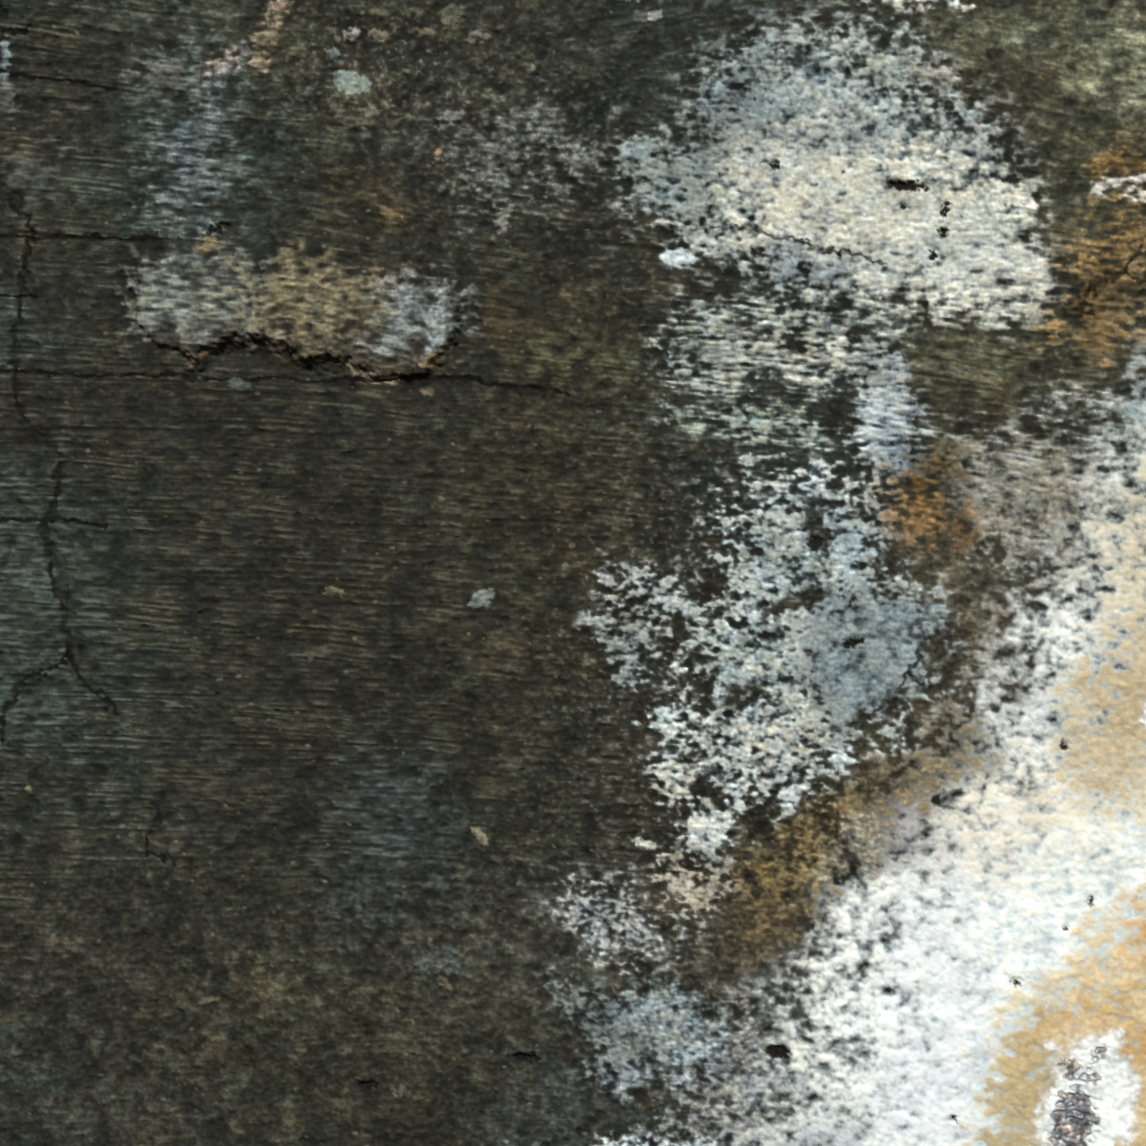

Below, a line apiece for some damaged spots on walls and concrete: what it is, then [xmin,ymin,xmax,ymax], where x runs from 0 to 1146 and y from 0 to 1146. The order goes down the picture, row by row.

crack [0,23,32,40]
damp [462,104,594,222]
crack [0,183,36,419]
damp [576,0,1054,932]
crack [0,452,118,742]
damp [940,423,1146,823]
damp [963,885,1146,1146]